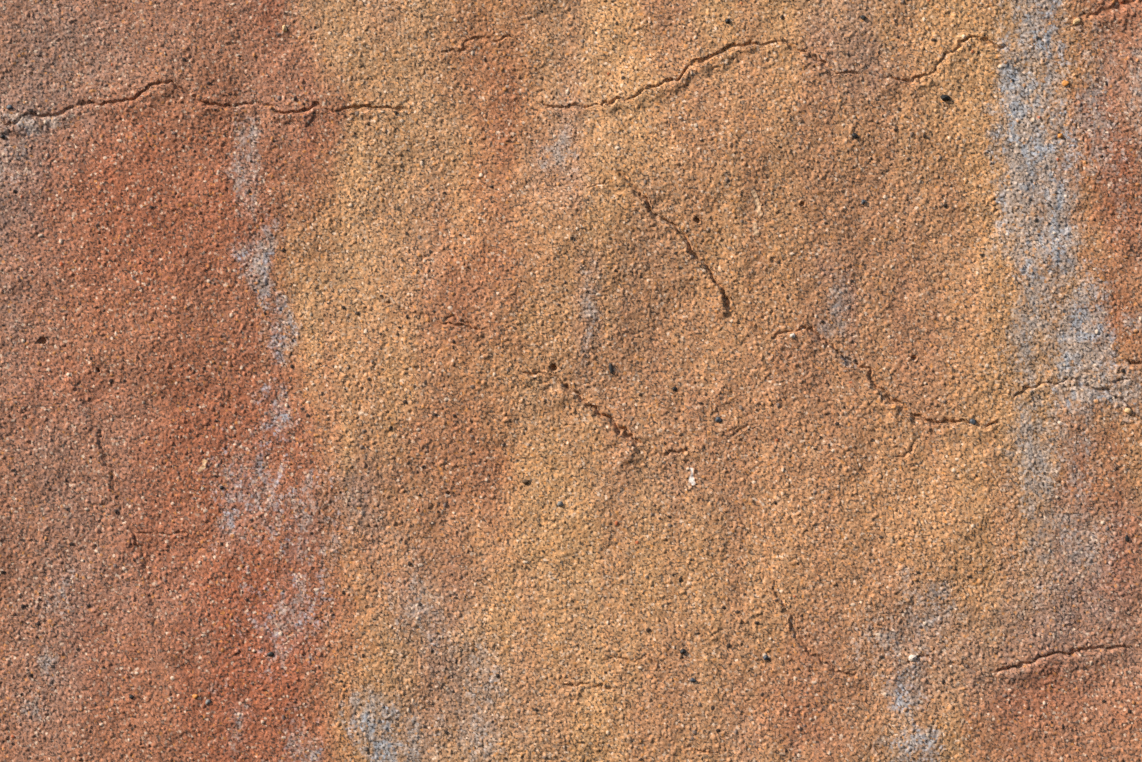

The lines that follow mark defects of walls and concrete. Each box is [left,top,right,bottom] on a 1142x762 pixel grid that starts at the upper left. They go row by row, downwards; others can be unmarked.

crack [0,79,411,129]
crack [540,35,1019,111]
crack [554,166,1142,460]
crack [518,369,695,460]
crack [771,581,858,679]
crack [888,643,1132,678]